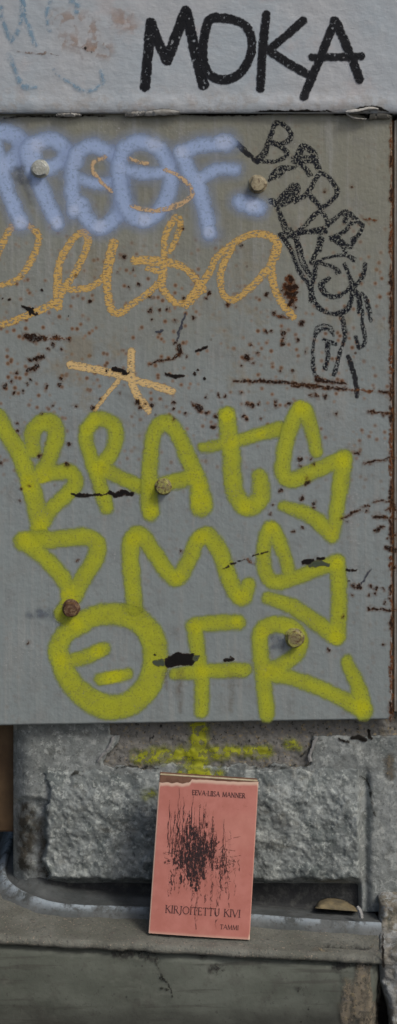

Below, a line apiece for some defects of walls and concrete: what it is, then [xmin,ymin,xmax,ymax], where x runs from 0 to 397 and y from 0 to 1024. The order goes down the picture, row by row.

corrosion [3,333,71,395]
corrosion [150,341,188,365]
corrosion [171,392,227,429]
corrosion [233,120,397,736]